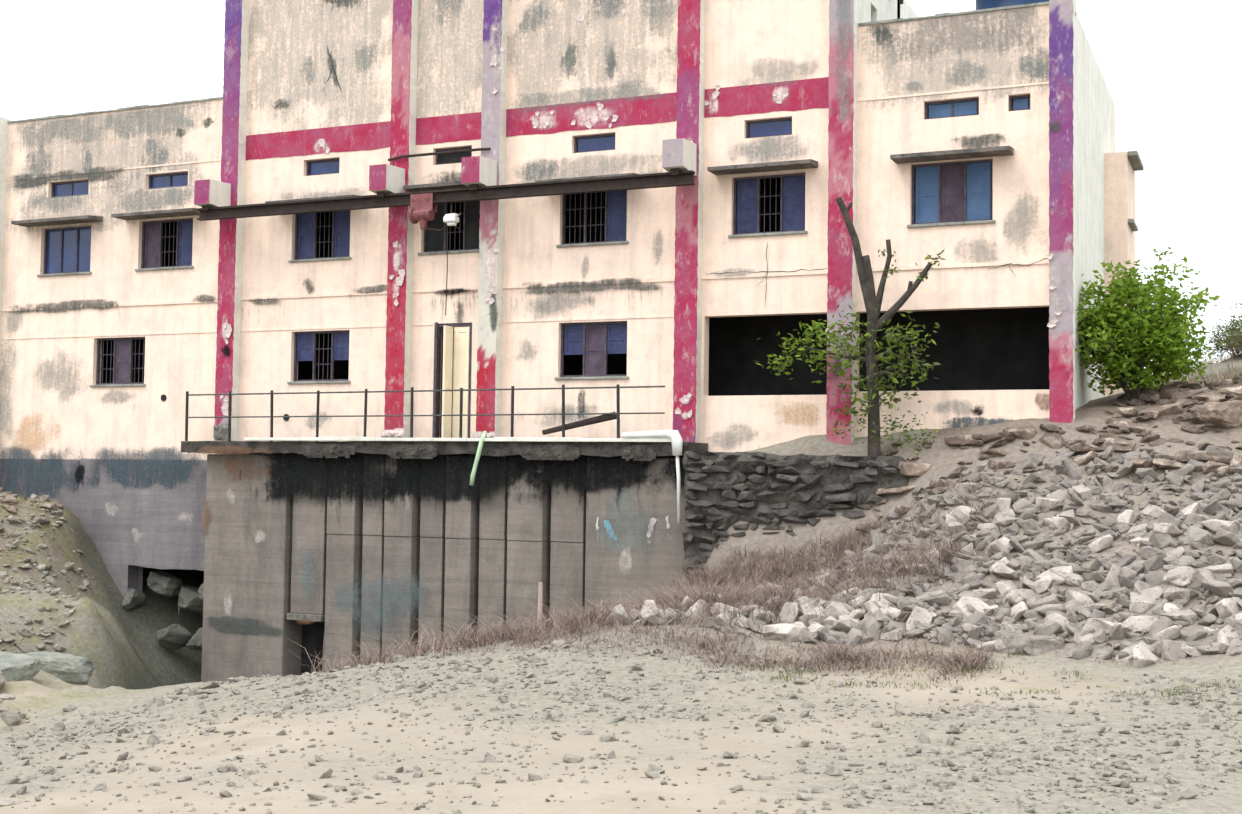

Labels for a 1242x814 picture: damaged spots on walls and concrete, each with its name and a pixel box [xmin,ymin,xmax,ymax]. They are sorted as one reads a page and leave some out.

leakage [872,25,892,42]
leakage [328,54,337,85]
leakage [562,45,576,74]
leakage [606,49,615,78]
peeling [532,110,554,128]
peeling [571,102,619,129]
leakage [14,150,122,188]
peeling [389,241,405,306]
leakage [528,278,660,312]
peeling [1046,253,1062,328]
leakage [0,421,198,498]
leakage [265,453,685,502]